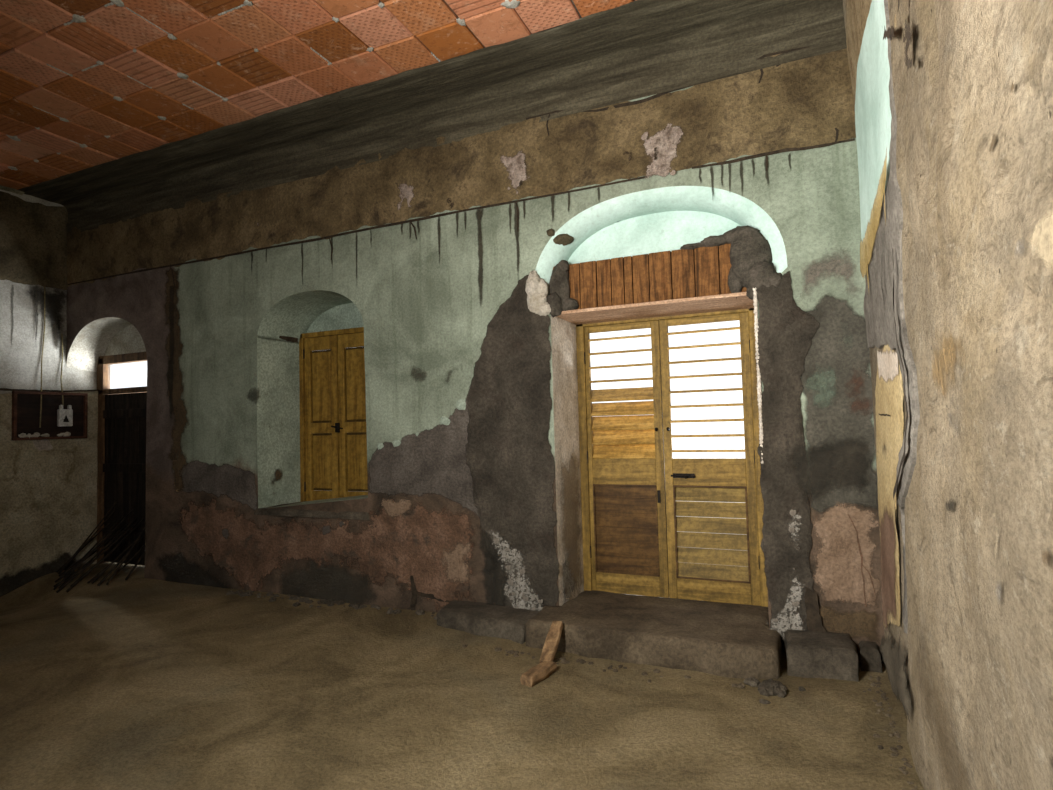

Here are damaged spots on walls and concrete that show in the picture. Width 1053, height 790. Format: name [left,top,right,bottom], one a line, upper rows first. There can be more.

flaking render [883,0,912,68]
flaking render [0,0,872,290]
water stain [699,156,769,196]
water stain [456,209,483,303]
water stain [509,201,525,271]
water stain [28,285,67,357]
flaking render [525,270,551,316]
peeling [172,385,478,611]
water stain [480,527,543,611]
water stain [767,568,805,639]
peeling [804,503,881,633]